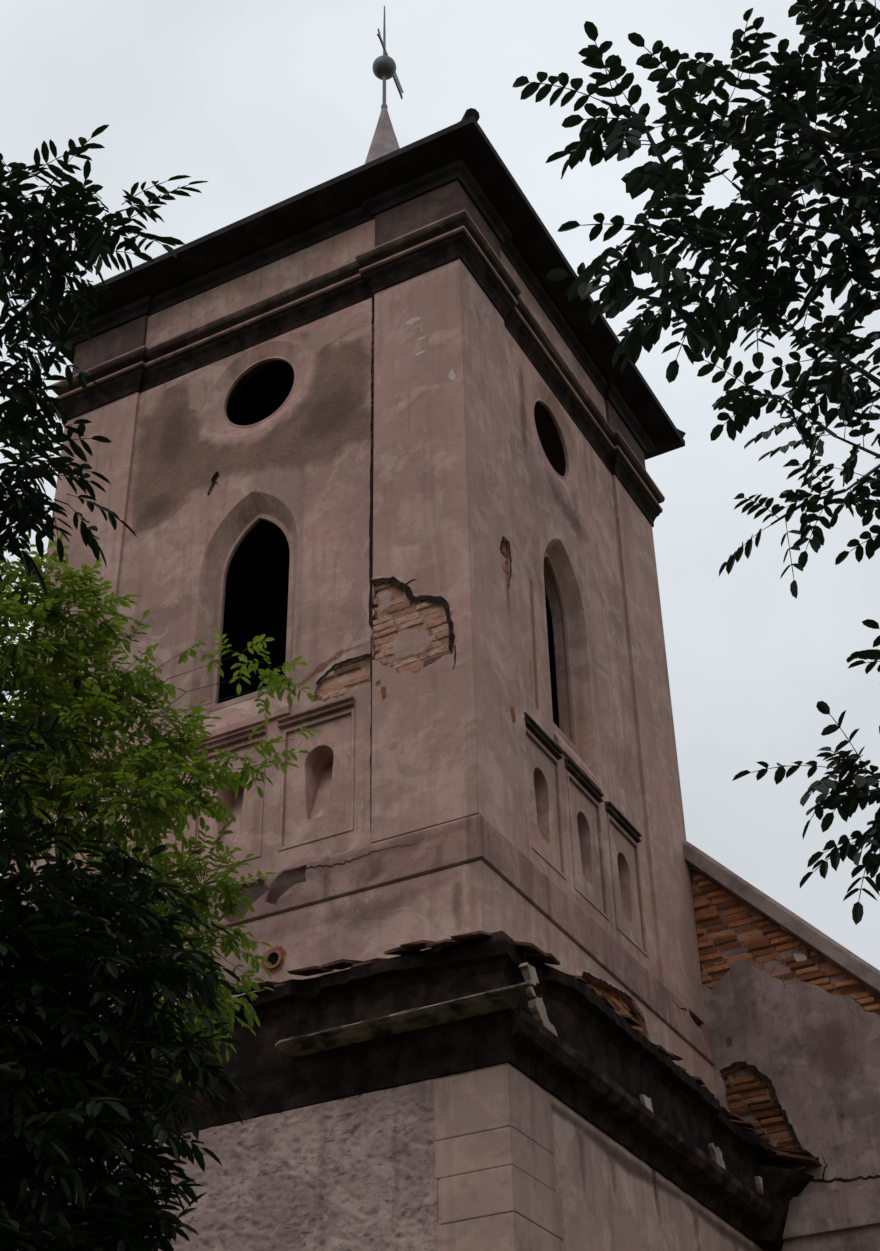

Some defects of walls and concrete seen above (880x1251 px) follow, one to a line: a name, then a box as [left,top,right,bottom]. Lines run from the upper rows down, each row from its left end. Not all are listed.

flaking render [302,575,458,702]
flaking render [690,872,880,1016]
flaking render [577,968,651,1042]
flaking render [719,1061,803,1150]
crack [811,1155,880,1183]